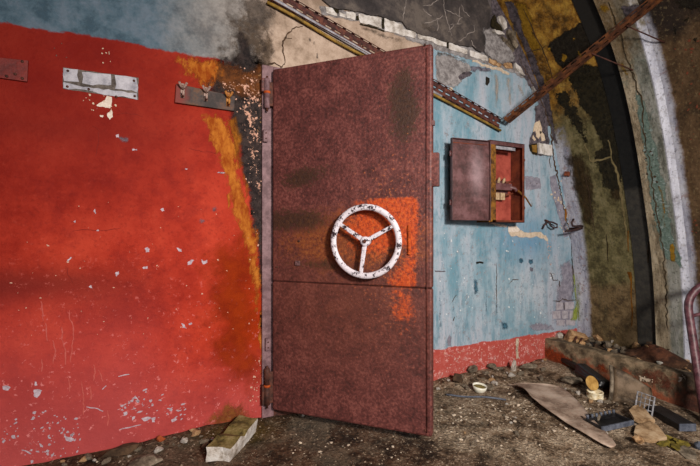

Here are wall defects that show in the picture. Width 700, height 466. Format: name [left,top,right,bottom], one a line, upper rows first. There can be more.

crack [269,26,303,68]
crack [423,0,476,48]
flaking render [63,67,139,120]
rust [177,56,261,100]
flaking render [319,0,558,156]
leakage [565,154,594,225]
rust [203,114,261,401]
flaking render [436,170,576,383]
spalling [118,388,186,422]
spalling [24,410,81,457]